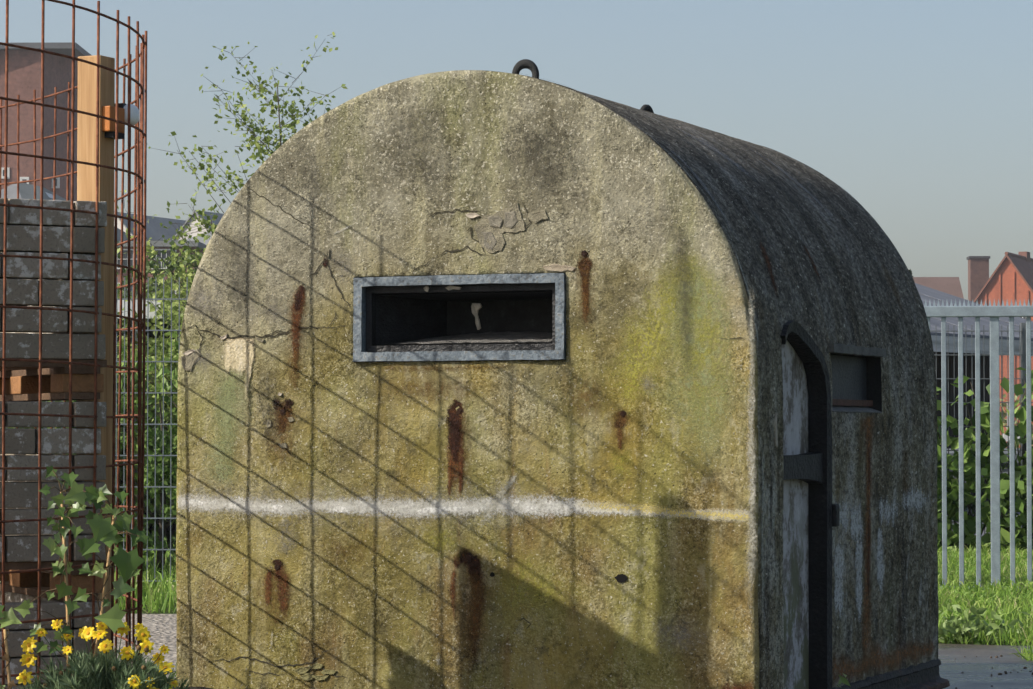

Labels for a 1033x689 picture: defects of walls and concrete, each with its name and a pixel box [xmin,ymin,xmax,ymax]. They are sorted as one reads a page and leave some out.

crack [178,182,350,350]
corrosion [290,262,324,385]
spalling [411,202,549,274]
corrosion [578,250,592,319]
corrosion [266,392,295,458]
corrosion [447,400,467,494]
corrosion [614,410,627,449]
corrosion [860,417,873,650]
corrosion [265,559,289,614]
corrosion [450,548,485,667]